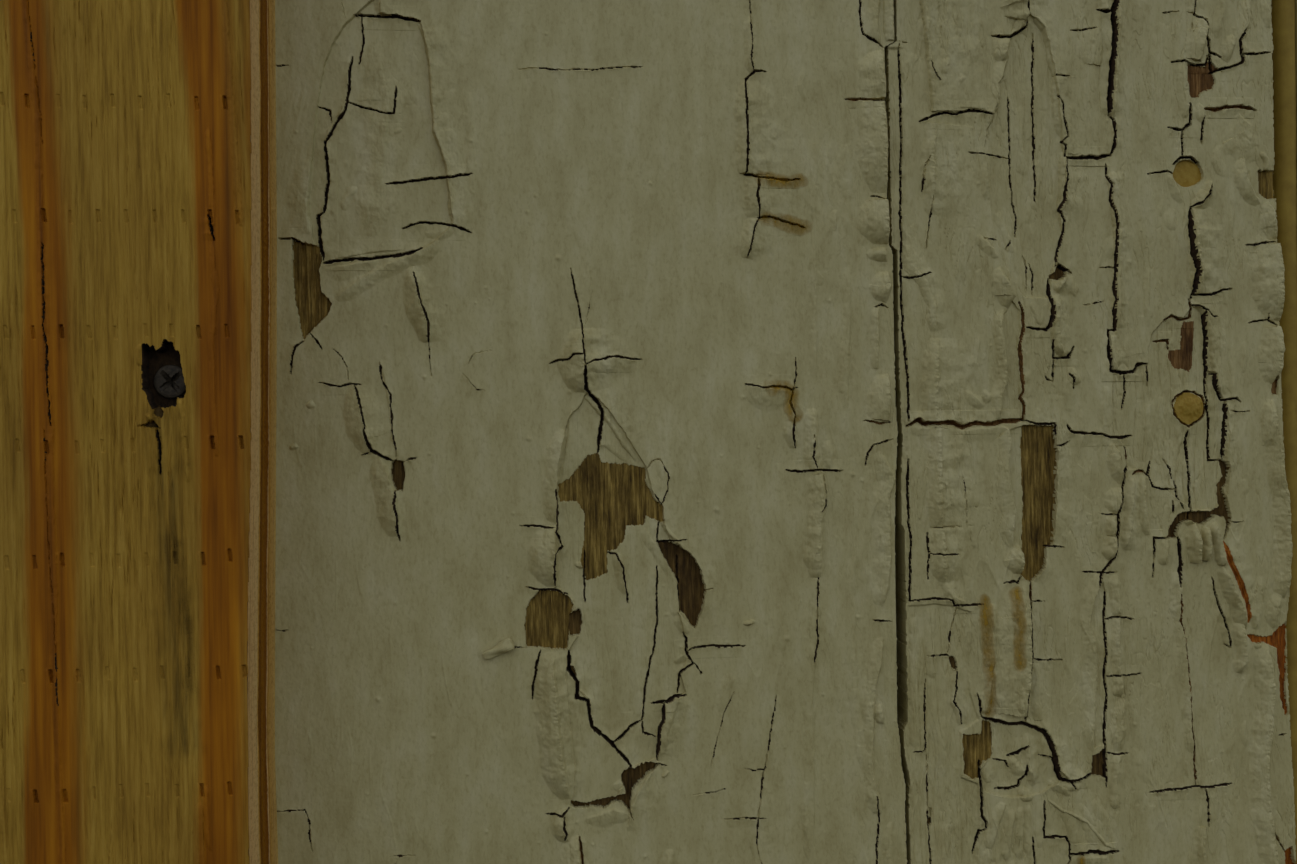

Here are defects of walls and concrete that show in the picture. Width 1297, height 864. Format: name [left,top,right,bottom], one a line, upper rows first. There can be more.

peeling [280,0,487,373]
crack [919,100,994,122]
peeling [319,362,416,540]
crack [906,410,1020,442]
peeling [858,0,1293,864]
peeling [483,274,743,843]
crack [908,581,982,607]
crack [1150,594,1231,864]
crack [1032,790,1120,864]